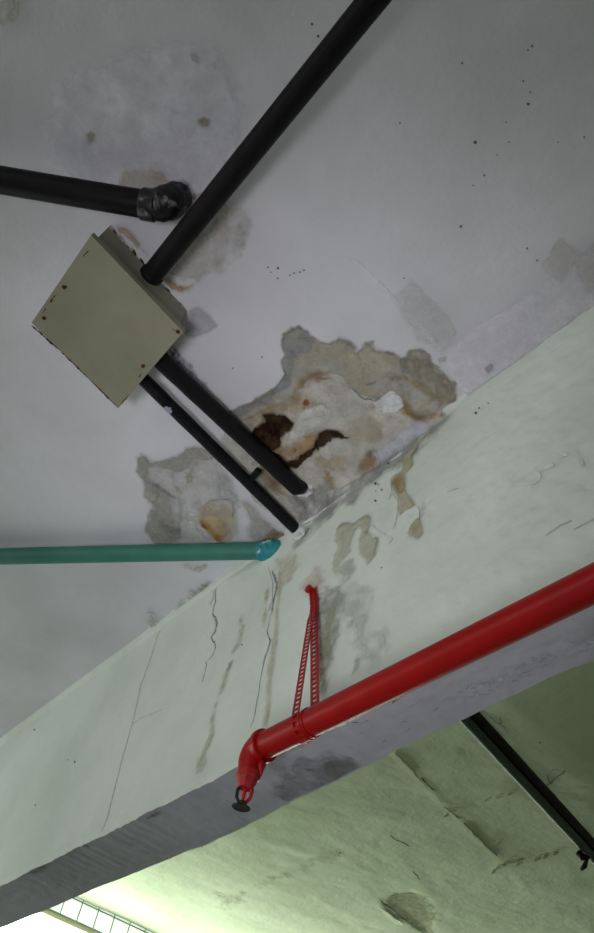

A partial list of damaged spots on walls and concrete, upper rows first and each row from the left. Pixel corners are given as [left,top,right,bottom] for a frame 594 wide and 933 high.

spalling [252,413,349,469]
damp [222,328,455,546]
rust [200,511,225,543]
damp [333,516,377,575]
peeling [370,480,420,544]
crack [202,587,218,681]
crack [250,569,278,727]
damp [302,569,365,692]
crack [101,633,162,832]
peeling [376,893,434,933]